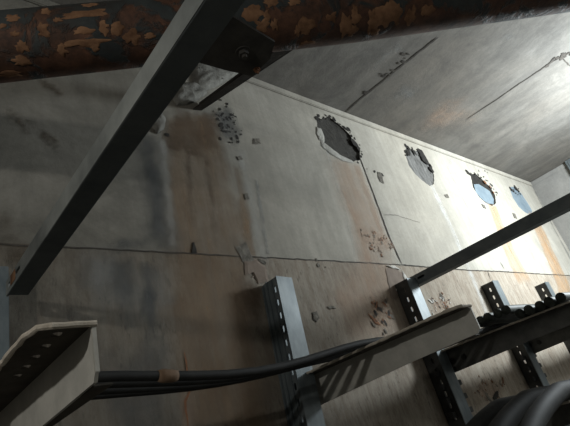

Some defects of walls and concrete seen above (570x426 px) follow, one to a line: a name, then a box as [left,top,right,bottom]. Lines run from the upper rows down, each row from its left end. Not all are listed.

crack [346,38,437,112]
crack [468,52,570,119]
spalling [213,99,242,143]
spalling [315,114,363,163]
crack [63,156,425,268]
spalling [404,144,434,186]
spalling [465,170,498,209]
spalling [509,185,532,214]
crack [456,265,570,277]
rust [536,227,570,292]